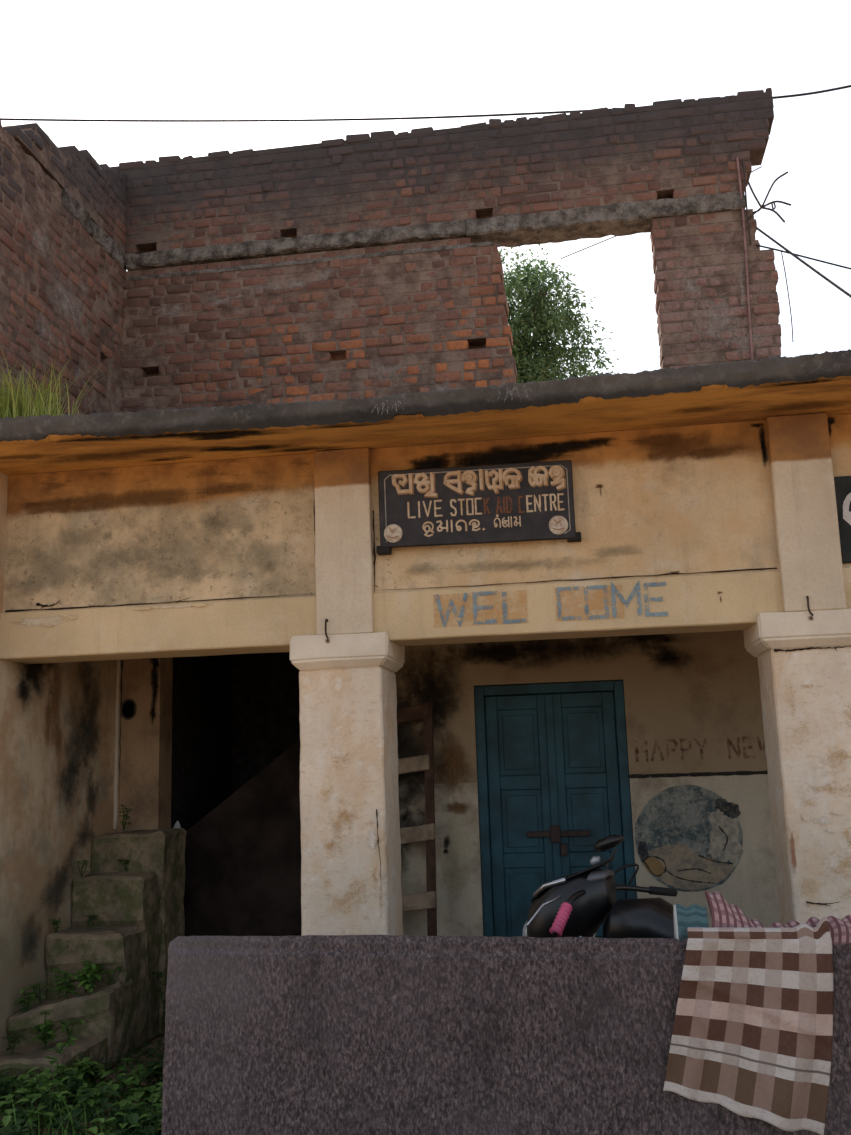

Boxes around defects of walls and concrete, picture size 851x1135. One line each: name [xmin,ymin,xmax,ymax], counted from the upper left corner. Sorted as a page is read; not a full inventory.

water stain [637,435,737,459]
water stain [207,485,245,494]
water stain [27,491,185,514]
water stain [19,663,100,811]
water stain [47,827,92,908]